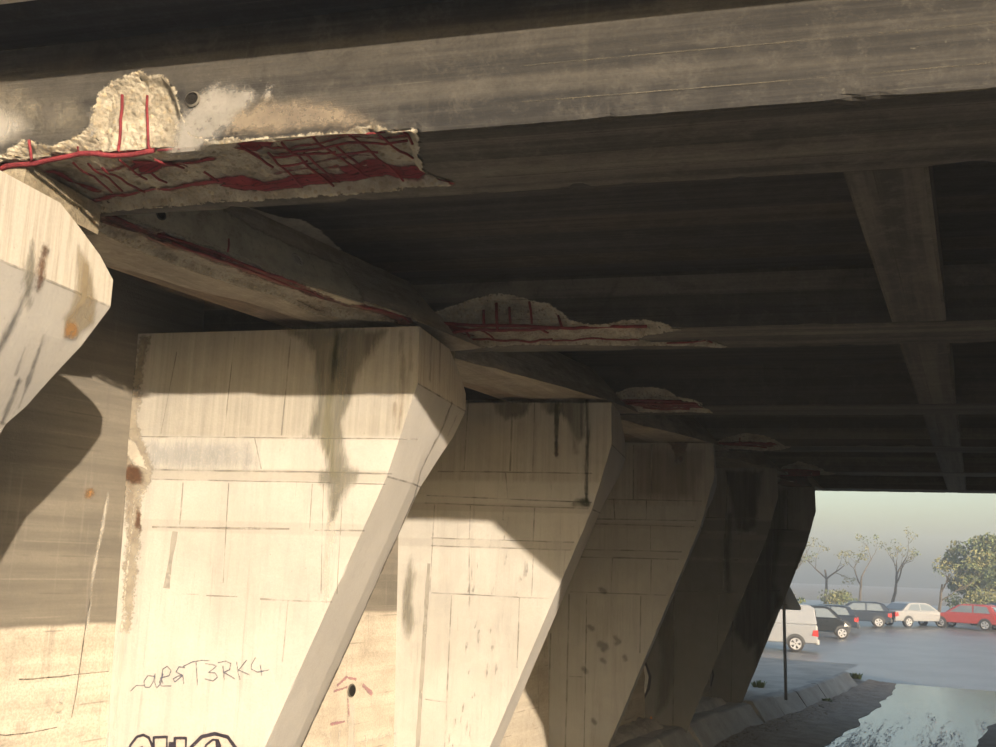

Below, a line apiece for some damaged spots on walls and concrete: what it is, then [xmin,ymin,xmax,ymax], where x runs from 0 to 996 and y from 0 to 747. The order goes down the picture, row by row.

efflorescence [170,85,272,155]
spalling [0,70,454,323]
leakage [26,246,49,288]
rust [65,254,94,338]
spalling [435,293,729,349]
leakage [292,328,380,522]
leakage [542,400,589,506]
spalling [616,387,712,413]